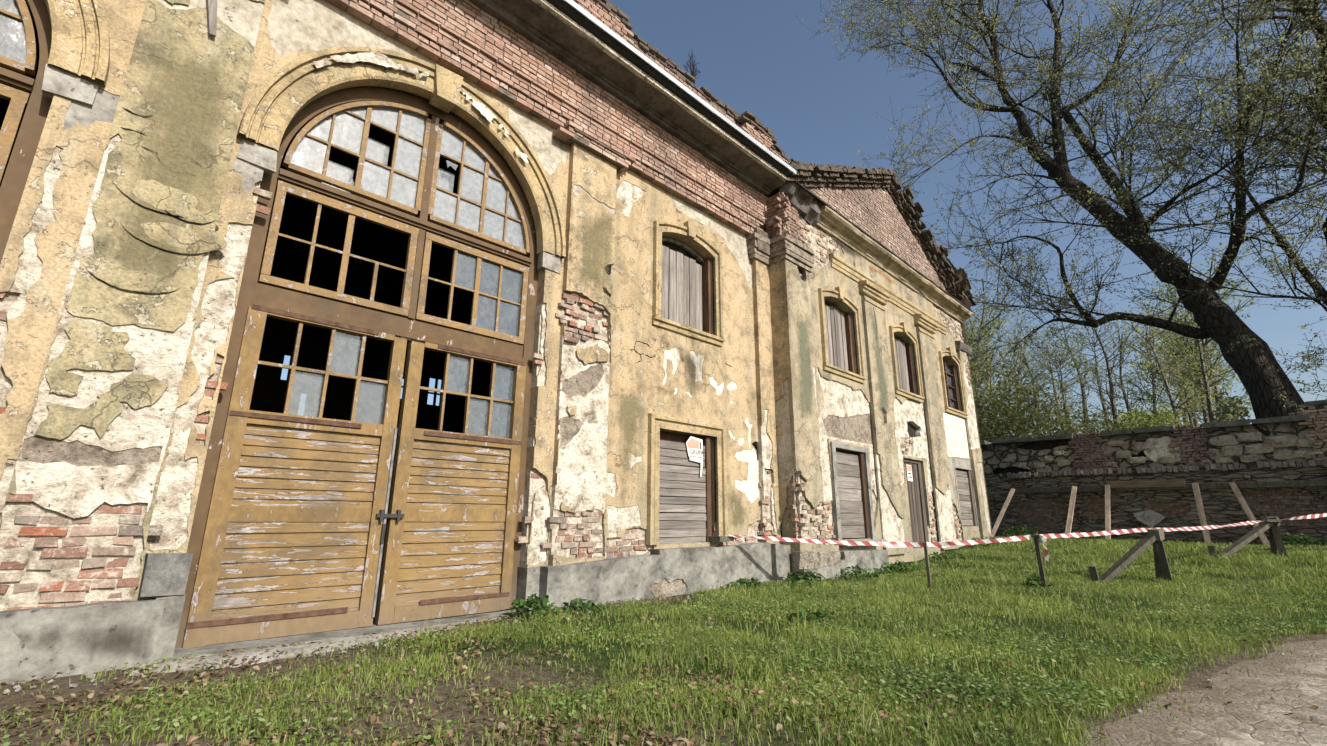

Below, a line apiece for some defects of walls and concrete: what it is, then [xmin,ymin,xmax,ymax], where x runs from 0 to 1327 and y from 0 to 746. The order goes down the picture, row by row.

damp [145,60,218,192]
damp [129,201,182,268]
flaking render [0,76,273,611]
flaking render [516,290,652,566]
flaking render [663,348,737,404]
flaking render [712,367,906,569]
flaking render [893,358,1030,548]
spalling [1018,439,1071,450]